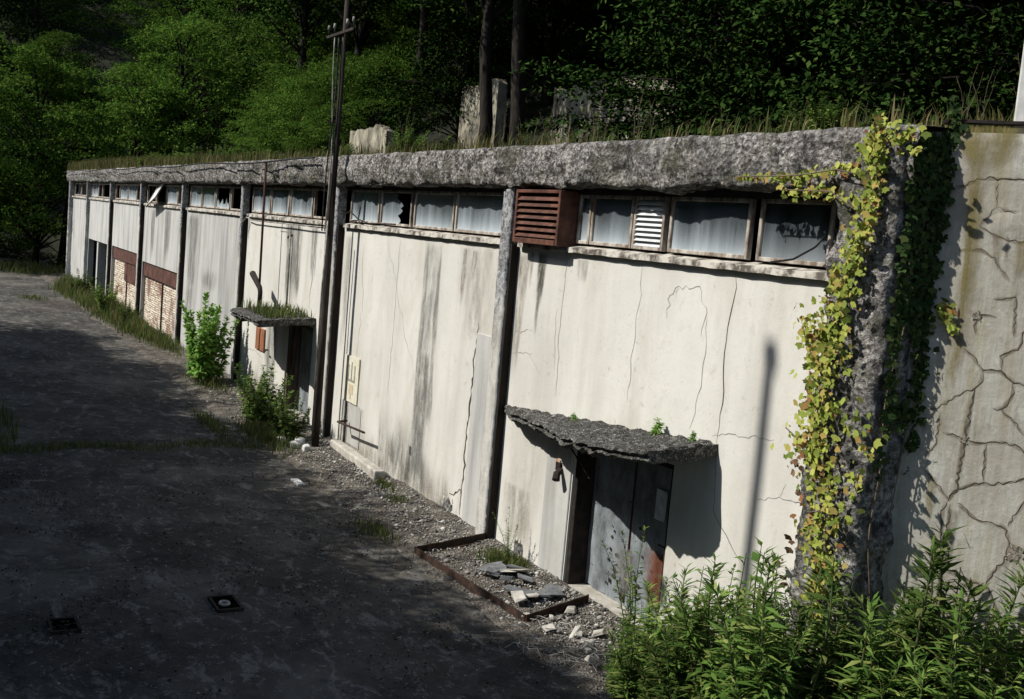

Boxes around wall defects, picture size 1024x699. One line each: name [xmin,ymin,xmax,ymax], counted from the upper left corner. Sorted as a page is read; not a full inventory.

leakage [411,258,441,498]
crack [449,323,479,515]
crack [666,273,771,560]
crack [925,176,1024,643]
rust [647,550,663,603]